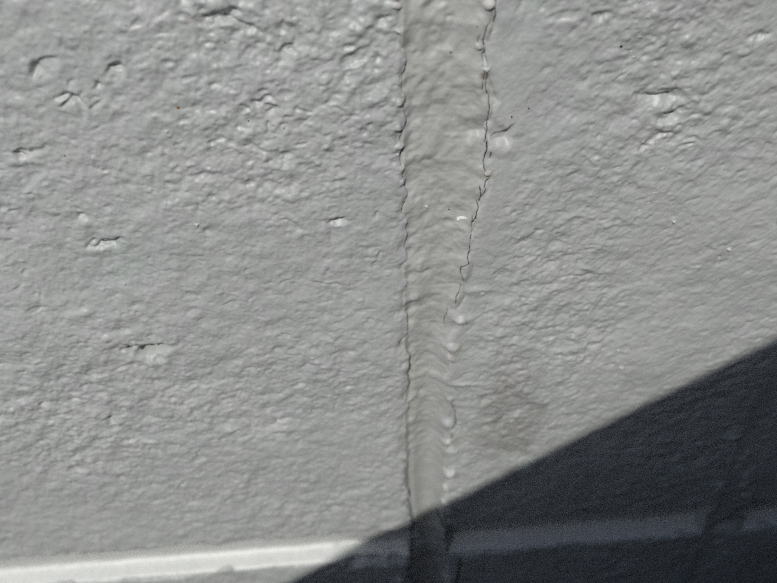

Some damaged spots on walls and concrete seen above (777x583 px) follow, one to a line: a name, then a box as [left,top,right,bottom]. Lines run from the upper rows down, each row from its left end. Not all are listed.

crack [443,2,497,327]